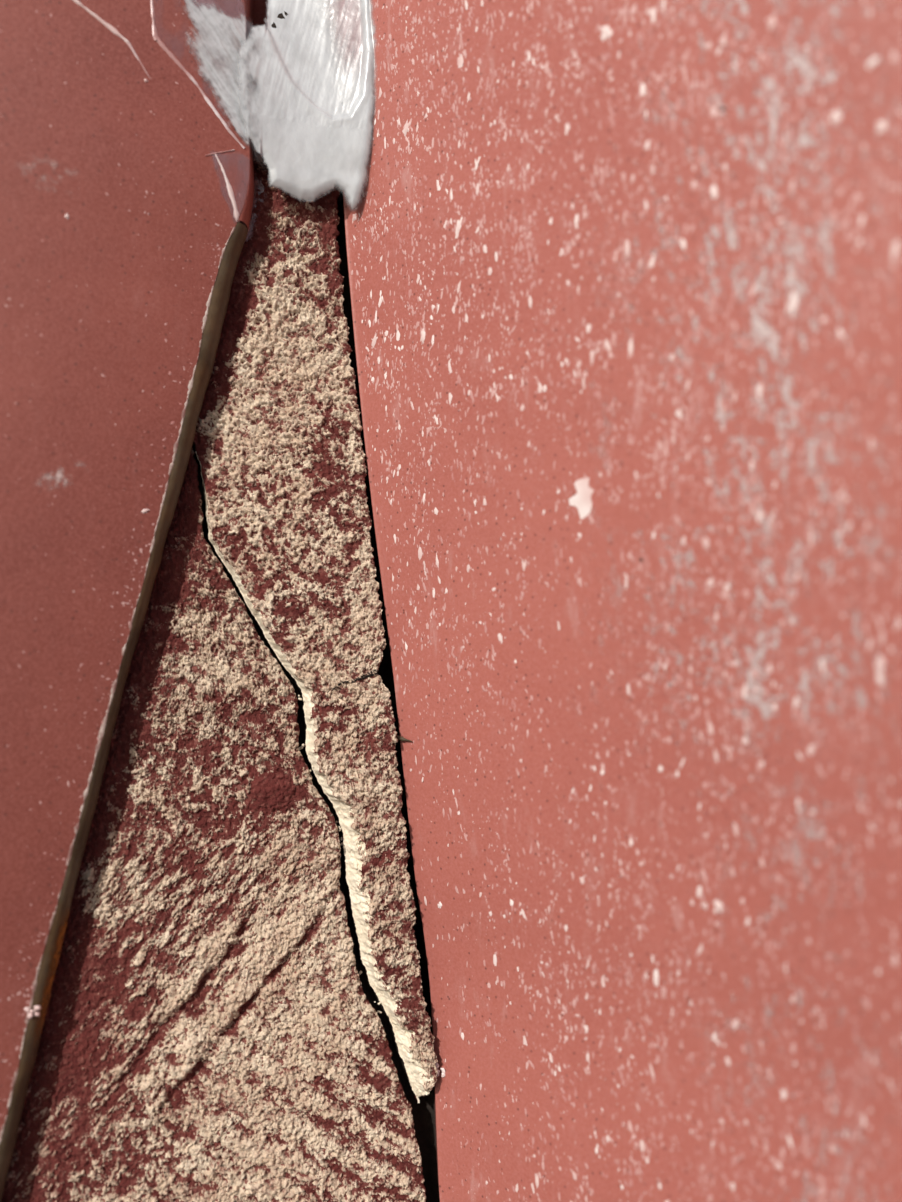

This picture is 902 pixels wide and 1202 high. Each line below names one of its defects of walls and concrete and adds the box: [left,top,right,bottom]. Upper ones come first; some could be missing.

peeling [6,150,438,1202]
crack [192,441,415,1098]